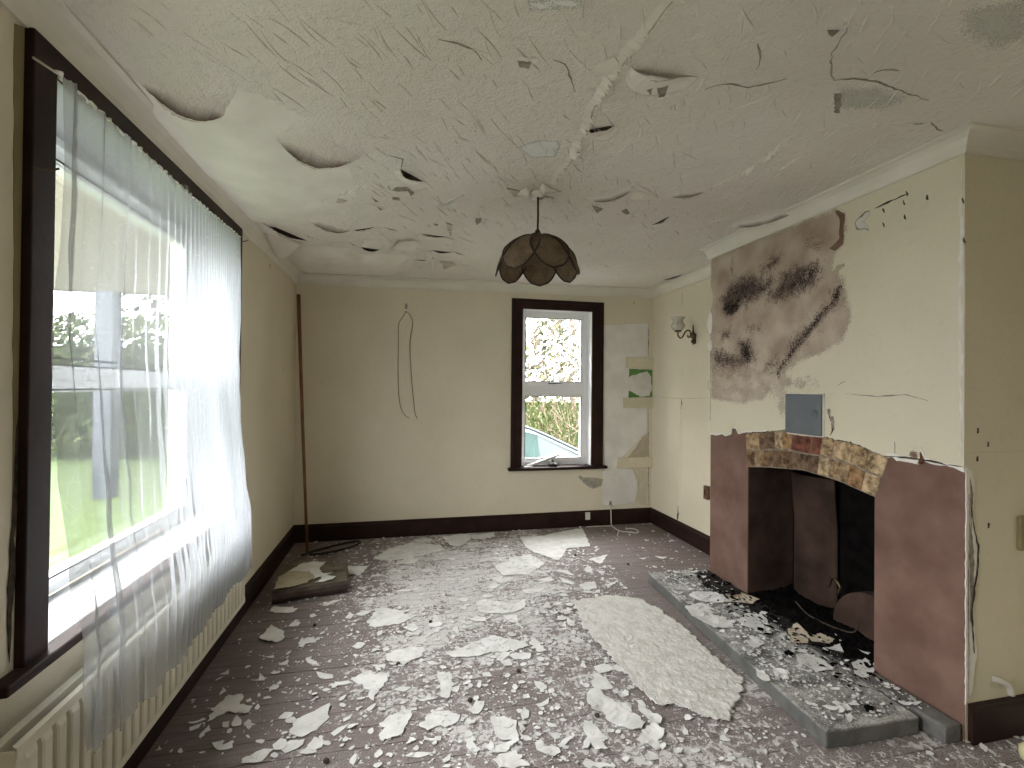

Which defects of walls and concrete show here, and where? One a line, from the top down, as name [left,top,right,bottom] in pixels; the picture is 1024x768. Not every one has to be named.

crack [553,60,575,92]
peeling [647,85,668,98]
crack [705,43,787,90]
crack [830,28,942,131]
peeling [388,186,414,200]
water stain [711,208,853,415]
flaking render [602,323,650,506]
peeling [884,166,980,705]